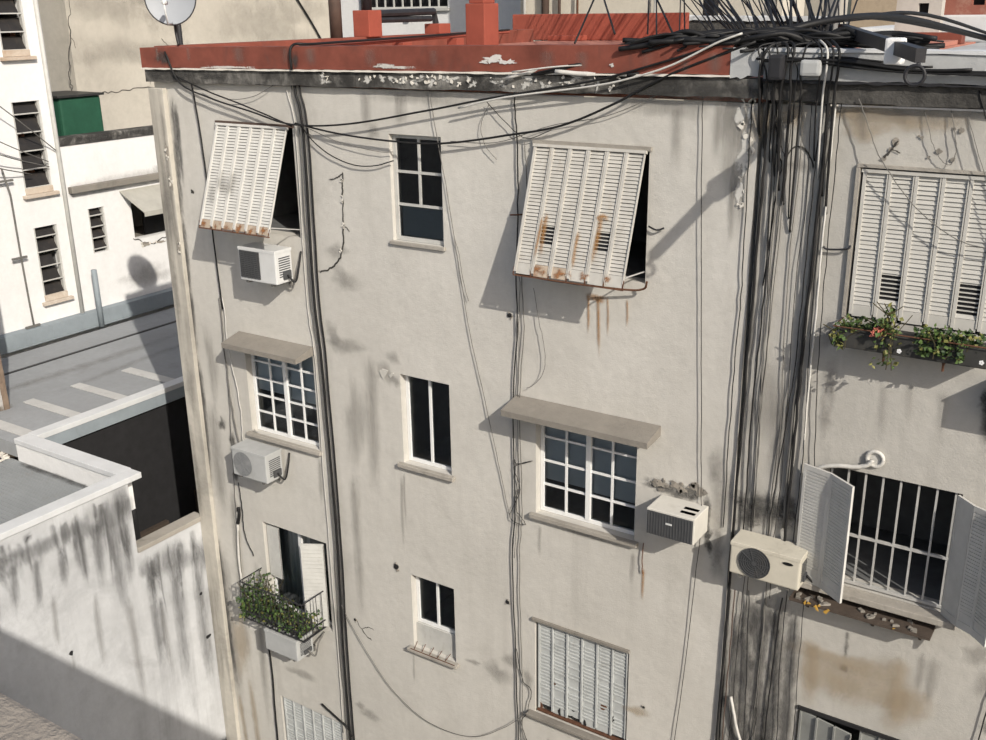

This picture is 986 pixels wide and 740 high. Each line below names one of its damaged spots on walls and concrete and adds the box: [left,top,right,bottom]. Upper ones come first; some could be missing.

crack [68,3,76,91]
peeling [358,74,477,88]
peeling [490,74,621,92]
peeling [734,98,756,208]
rust [199,222,270,238]
crack [320,172,350,273]
rust [512,267,624,340]
peeling [651,478,708,497]
damp [720,607,796,740]